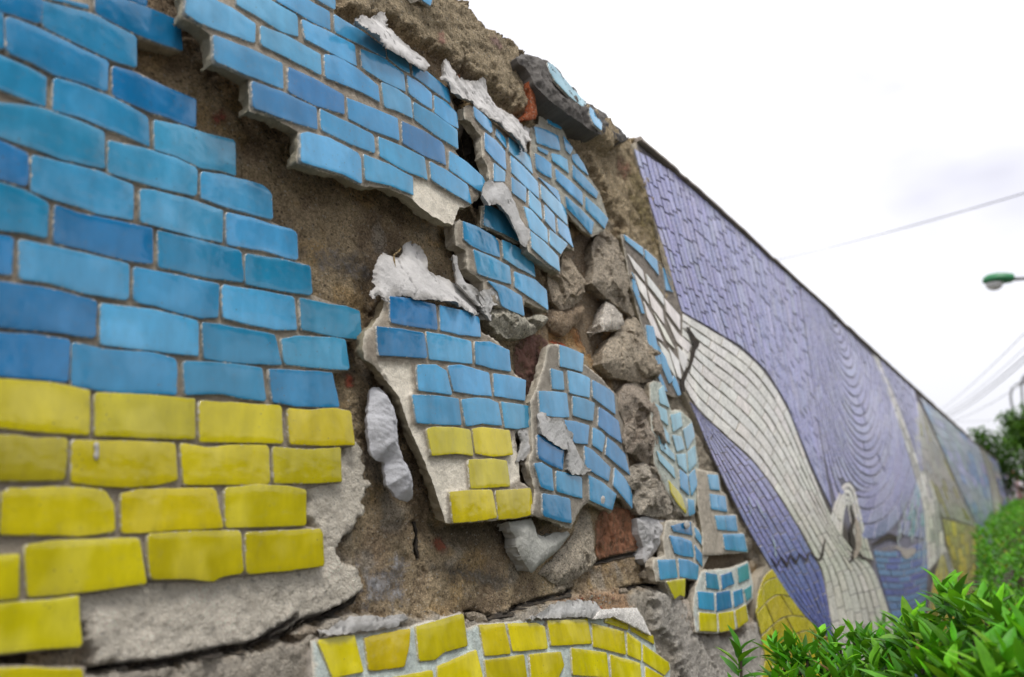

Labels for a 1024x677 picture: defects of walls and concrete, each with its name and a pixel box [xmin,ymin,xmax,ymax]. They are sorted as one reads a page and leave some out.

spalling [147,0,177,18]
spalling [333,0,538,128]
spalling [25,29,763,677]
crack [85,594,357,673]
crack [465,589,572,620]
crack [626,582,656,590]